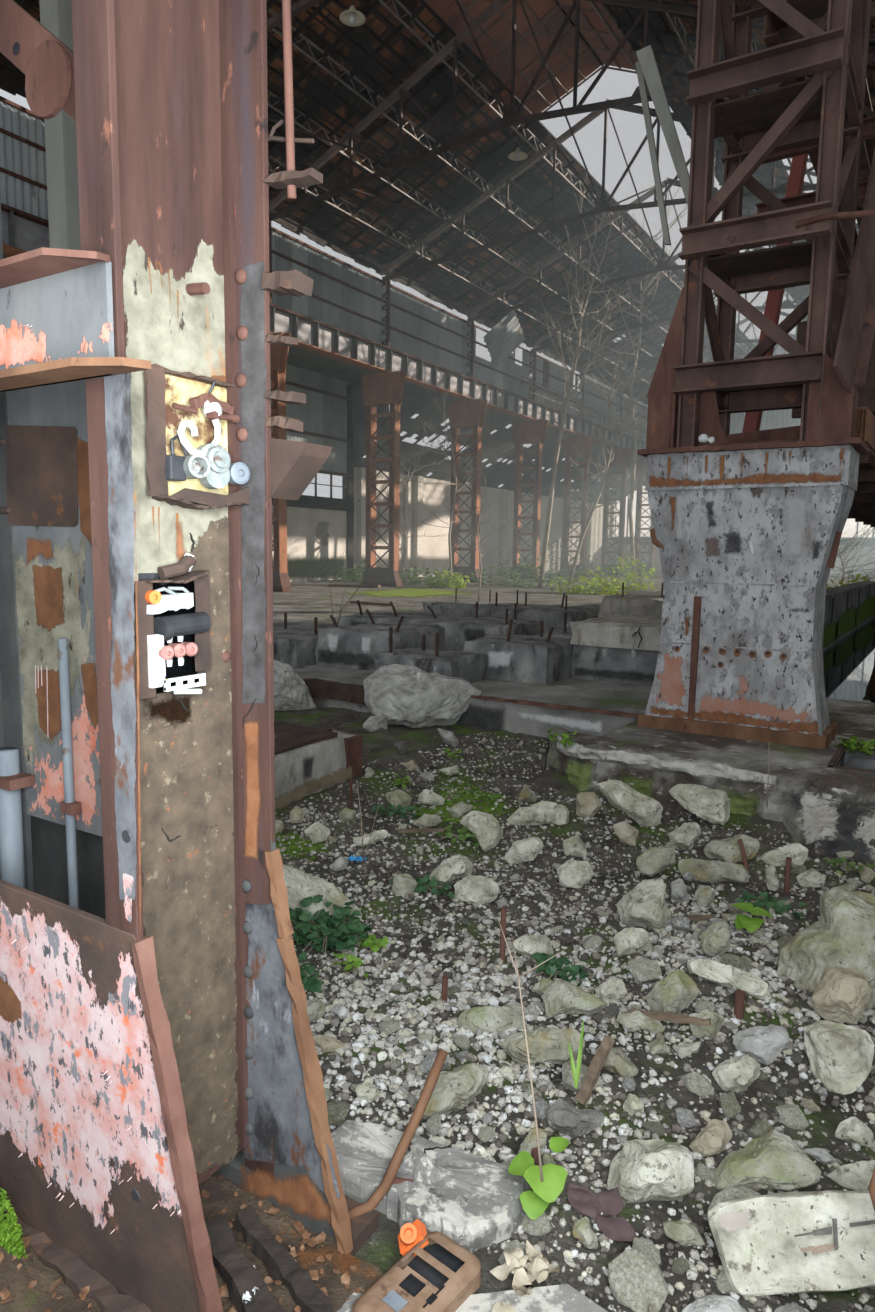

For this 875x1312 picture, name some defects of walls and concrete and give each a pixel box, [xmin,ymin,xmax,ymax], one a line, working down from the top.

peeling [0,319,51,369]
corrosion [650,449,844,530]
corrosion [27,539,65,632]
peeling [14,239,267,923]
corrosion [651,706,818,733]
peeling [655,653,815,723]
corrosion [703,646,787,668]
peeling [0,901,182,1234]
corrosion [212,1167,376,1301]
corrosion [0,1277,92,1312]
corrosion [214,1266,237,1312]
corrosion [263,1276,301,1312]